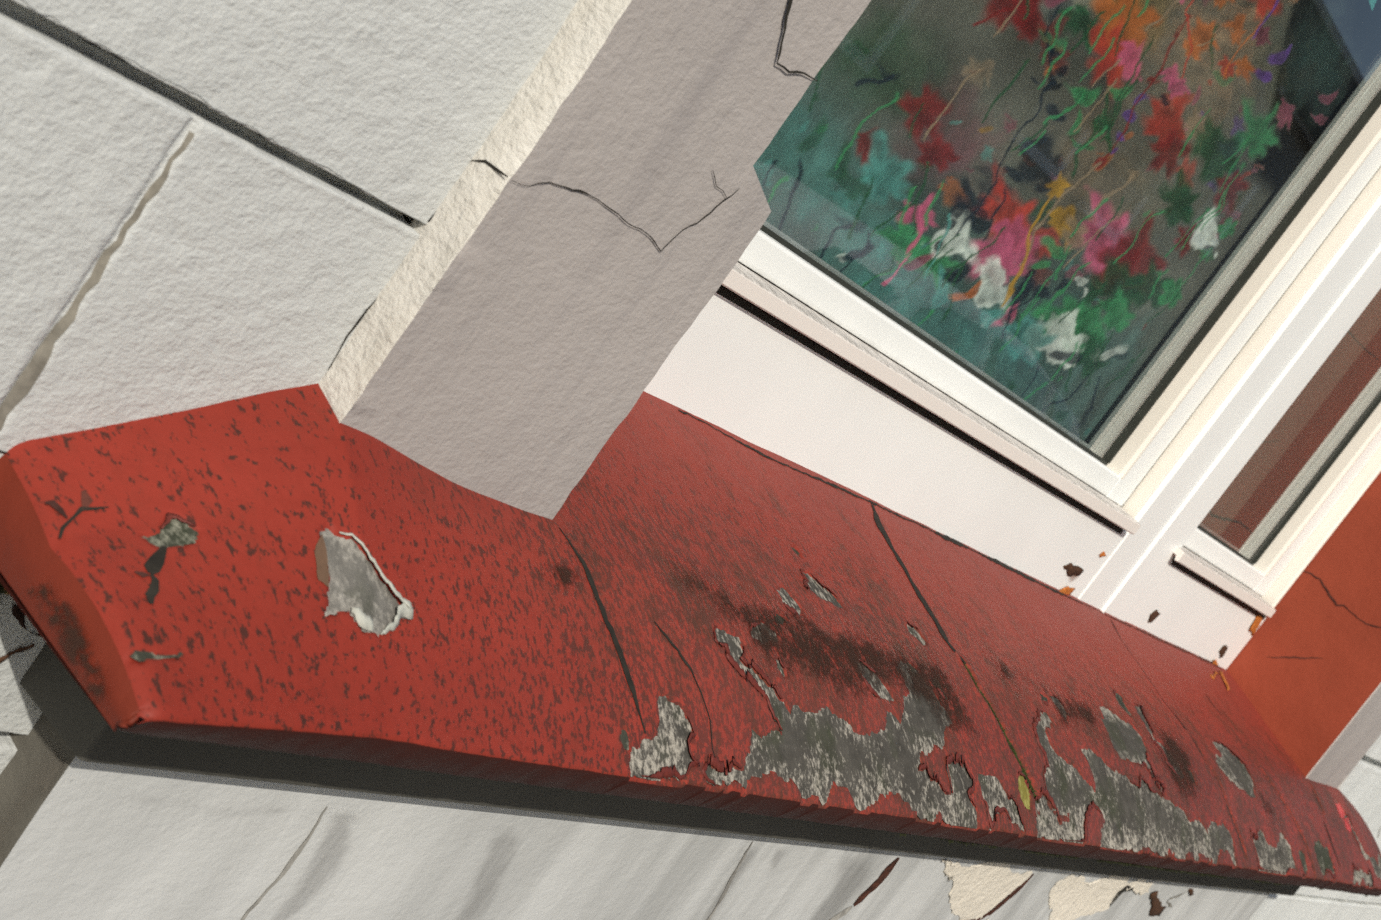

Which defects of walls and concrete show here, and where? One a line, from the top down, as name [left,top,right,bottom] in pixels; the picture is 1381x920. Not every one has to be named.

crack [0,0,366,454]
crack [471,160,740,252]
crack [135,545,167,604]
peeling [142,513,199,548]
peeling [315,528,414,637]
crack [560,528,646,734]
damp [706,587,973,728]
peeling [620,548,1236,866]
crack [678,409,1244,852]
flaking render [941,859,1033,920]
flaking render [1048,874,1154,920]
peeling [1250,828,1336,879]